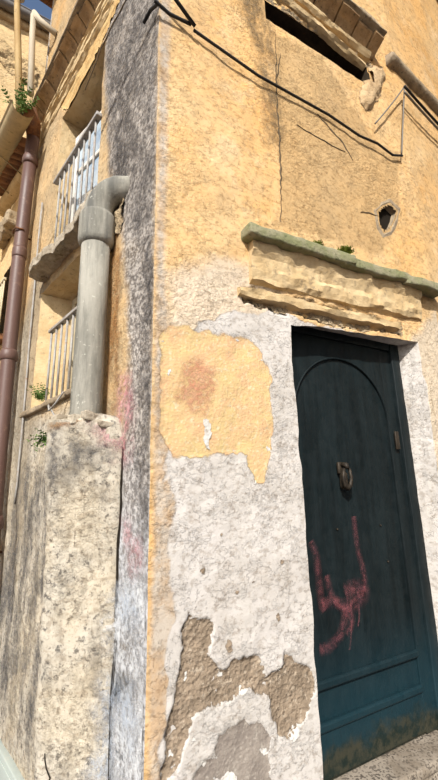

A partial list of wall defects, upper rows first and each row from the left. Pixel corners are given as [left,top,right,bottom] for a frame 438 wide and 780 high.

peeling [159,325,273,484]
leakage [0,467,45,627]
crack [108,447,124,780]
spalling [159,612,315,780]